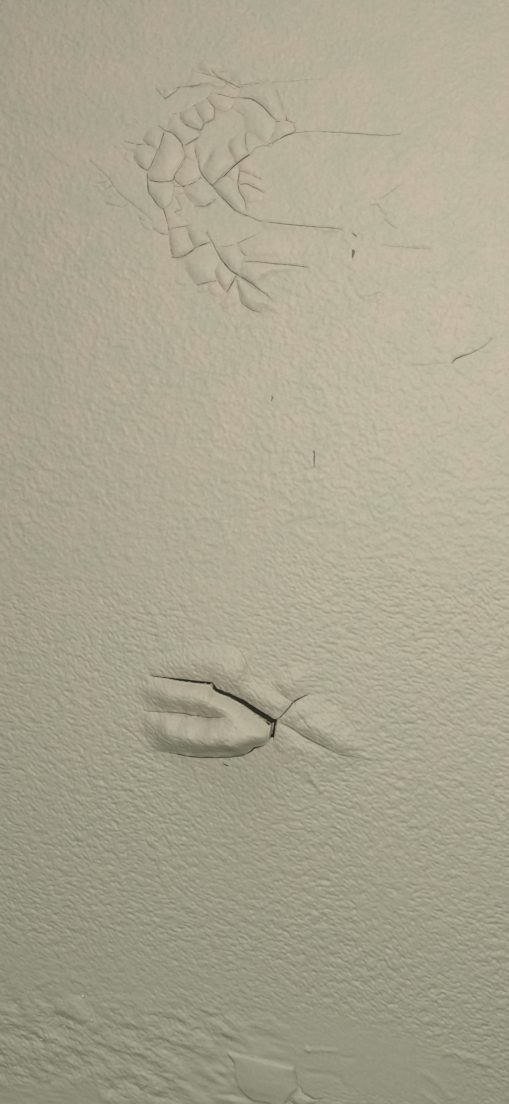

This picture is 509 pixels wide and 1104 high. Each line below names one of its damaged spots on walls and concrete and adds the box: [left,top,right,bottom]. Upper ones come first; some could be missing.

flaking render [226,1051,321,1104]